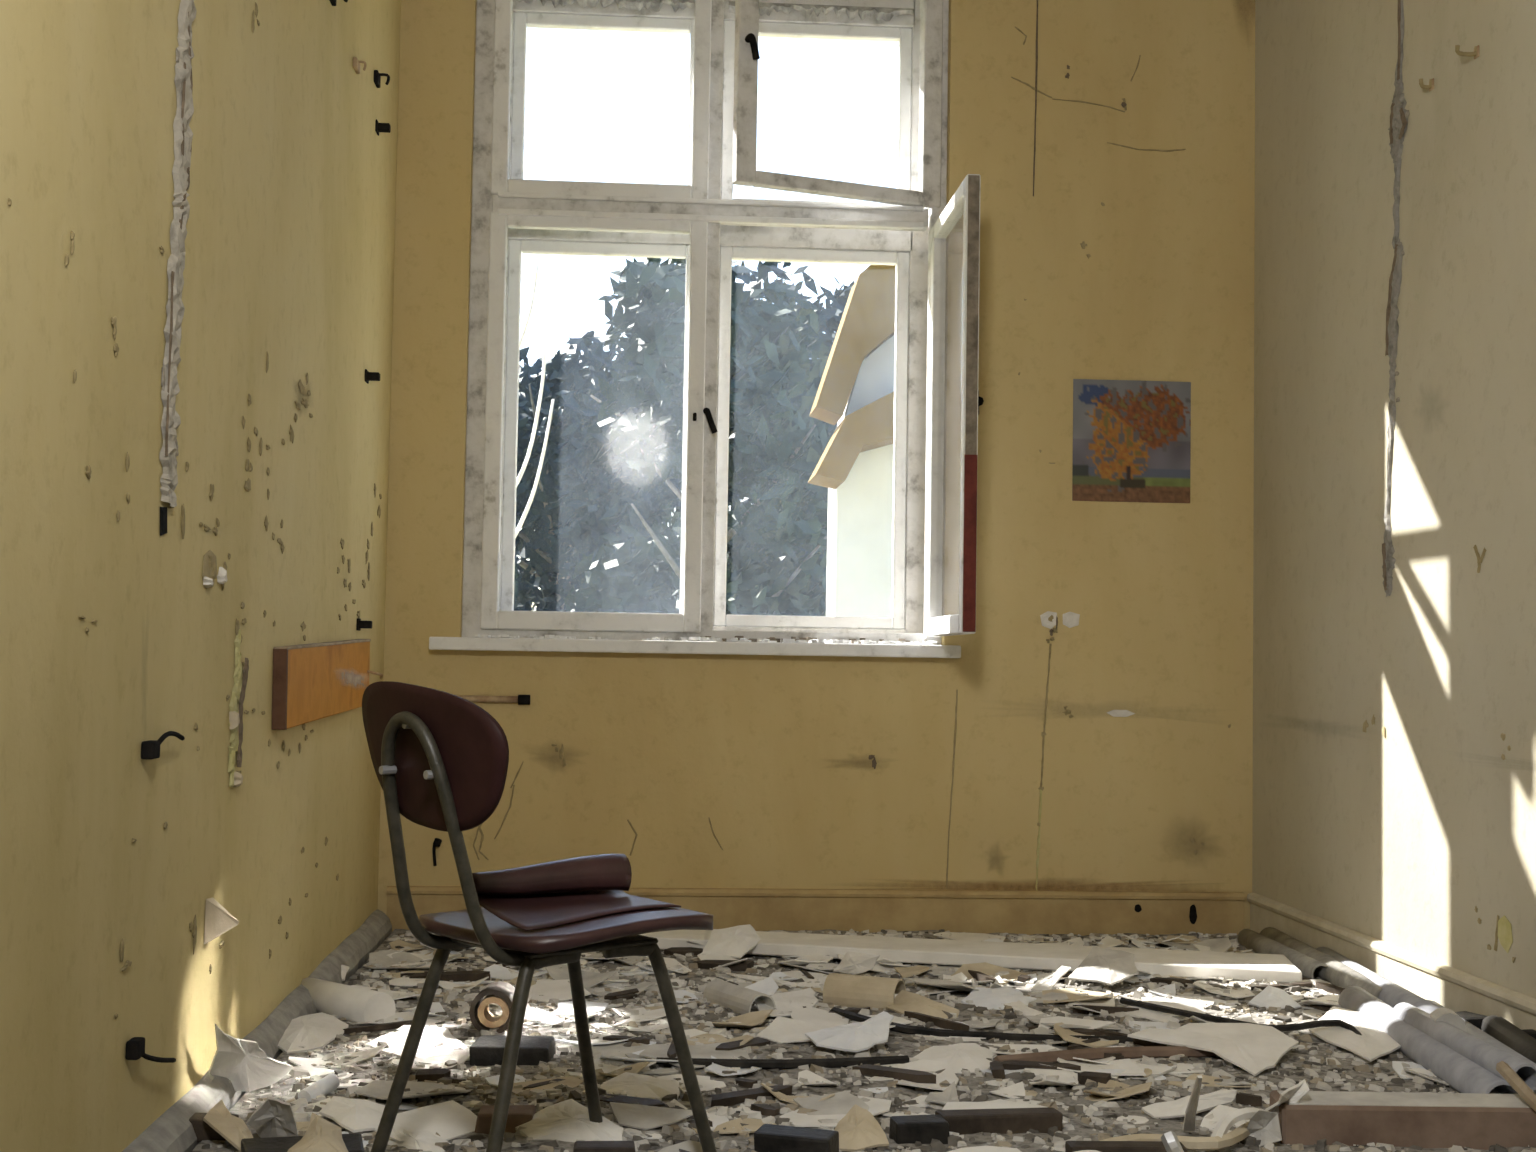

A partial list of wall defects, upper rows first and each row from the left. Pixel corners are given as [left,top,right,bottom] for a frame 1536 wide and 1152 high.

crack [1382,0,1410,597]
spalling [160,484,231,590]
peeling [226,602,276,788]